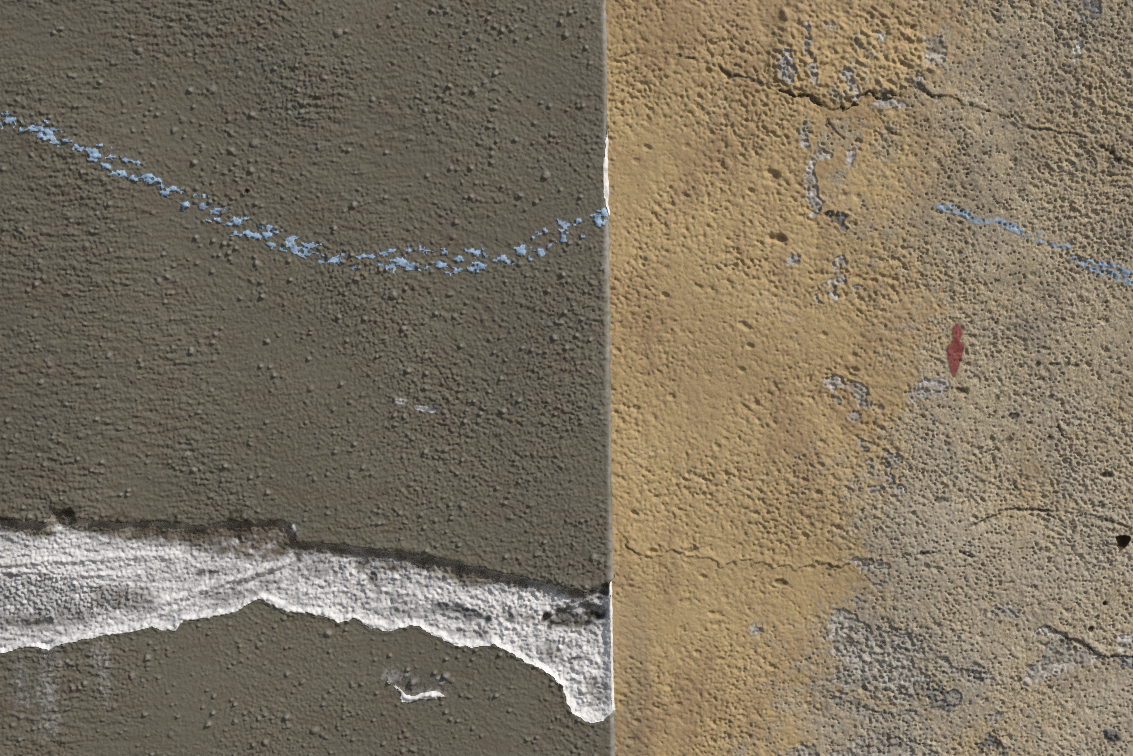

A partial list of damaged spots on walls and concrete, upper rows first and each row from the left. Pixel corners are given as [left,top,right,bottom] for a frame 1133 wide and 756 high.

peeling [776,21,818,84]
peeling [923,35,946,65]
peeling [840,68,908,109]
crack [720,67,1133,165]
peeling [800,121,857,231]
crack [915,504,1127,561]
flaking render [0,508,615,723]
crack [1054,630,1123,658]
peeling [785,597,995,756]